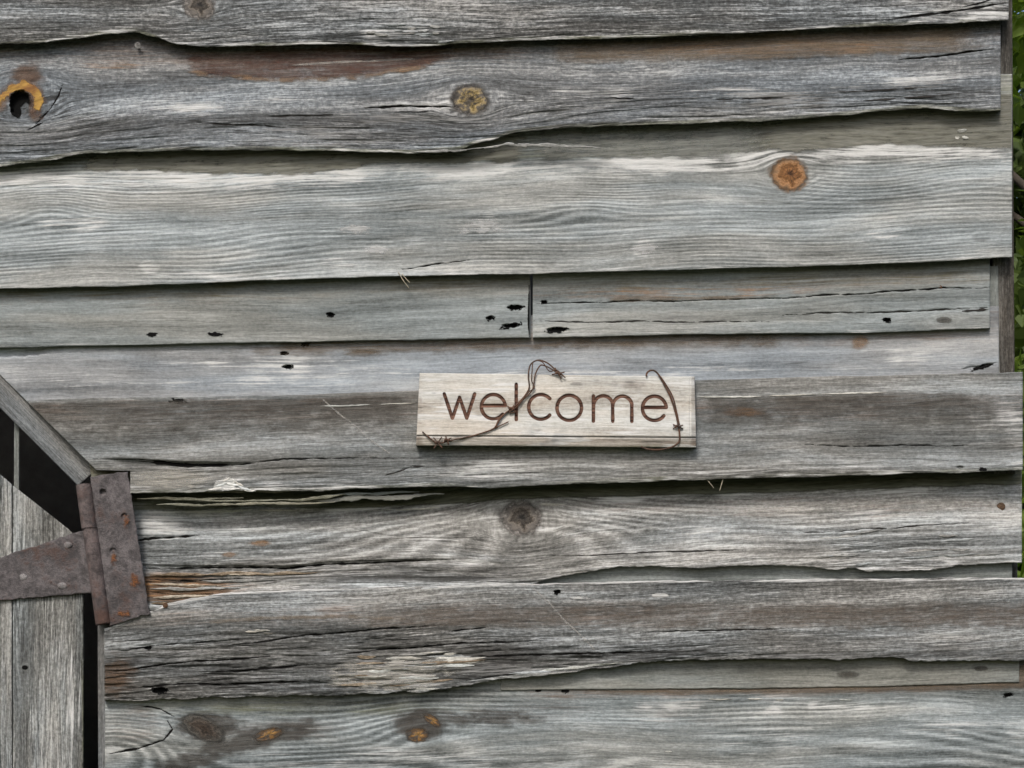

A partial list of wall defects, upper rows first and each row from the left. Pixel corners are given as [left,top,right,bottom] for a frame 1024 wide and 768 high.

crack [29,87,62,129]
crack [547,287,987,323]
crack [110,624,791,754]